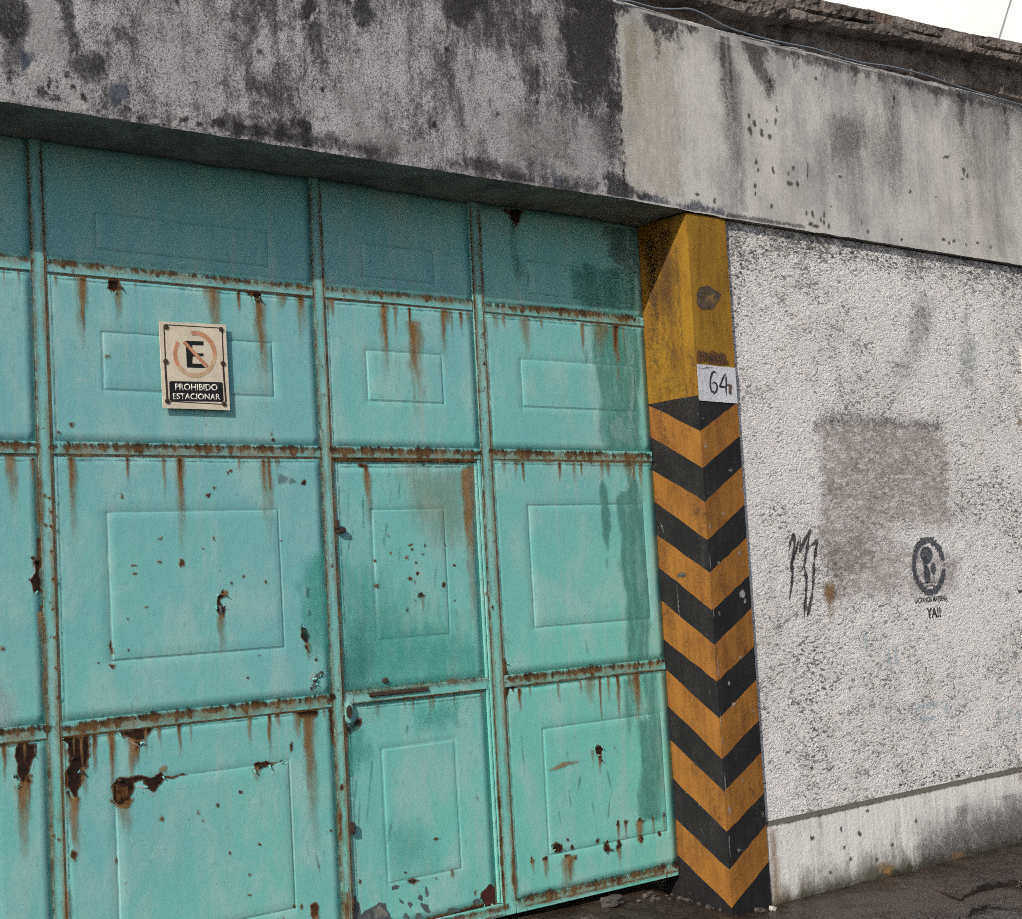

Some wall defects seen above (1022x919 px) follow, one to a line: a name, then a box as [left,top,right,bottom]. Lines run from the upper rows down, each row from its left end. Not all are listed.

water stain [0,0,33,46]
water stain [302,0,316,19]
water stain [340,0,375,29]
water stain [68,51,104,83]
water stain [220,113,435,154]
water stain [442,0,1022,335]
rust [0,143,679,919]
peeling [352,871,497,919]